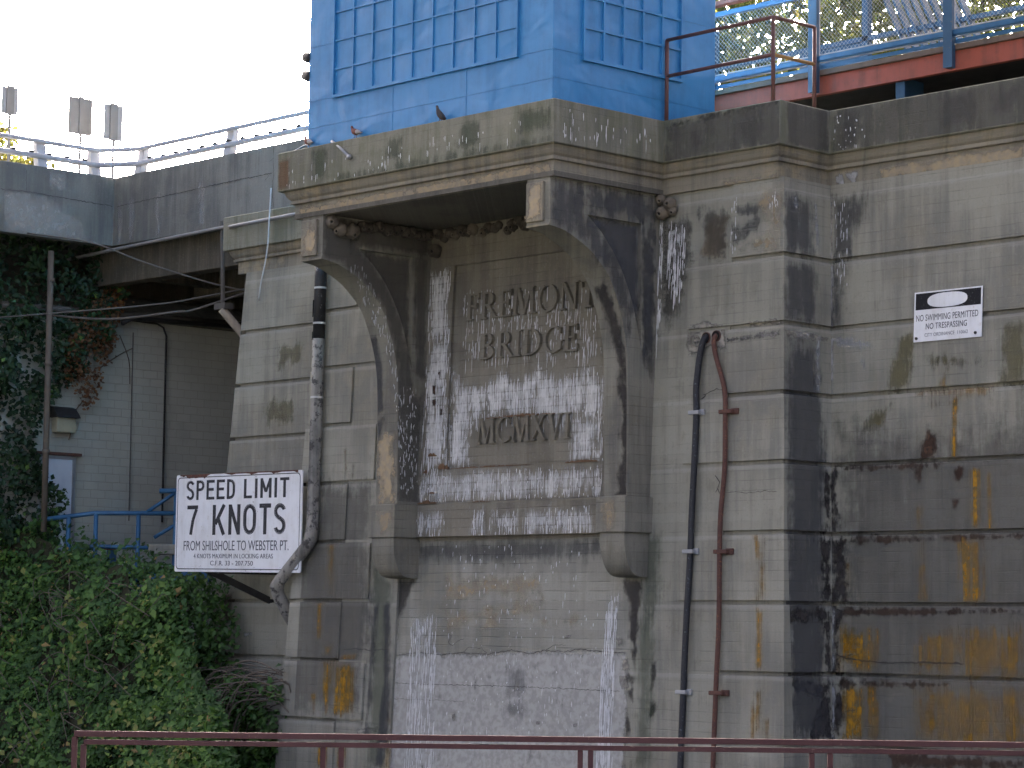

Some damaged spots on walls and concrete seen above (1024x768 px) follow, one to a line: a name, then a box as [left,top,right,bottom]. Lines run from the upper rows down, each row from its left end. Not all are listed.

water stain [731,192,815,322]
water stain [300,164,685,551]
water stain [784,199,1023,740]
corrosion [973,468,990,529]
corrosion [312,650,353,714]
water stain [365,580,641,768]
corrosion [843,688,876,738]